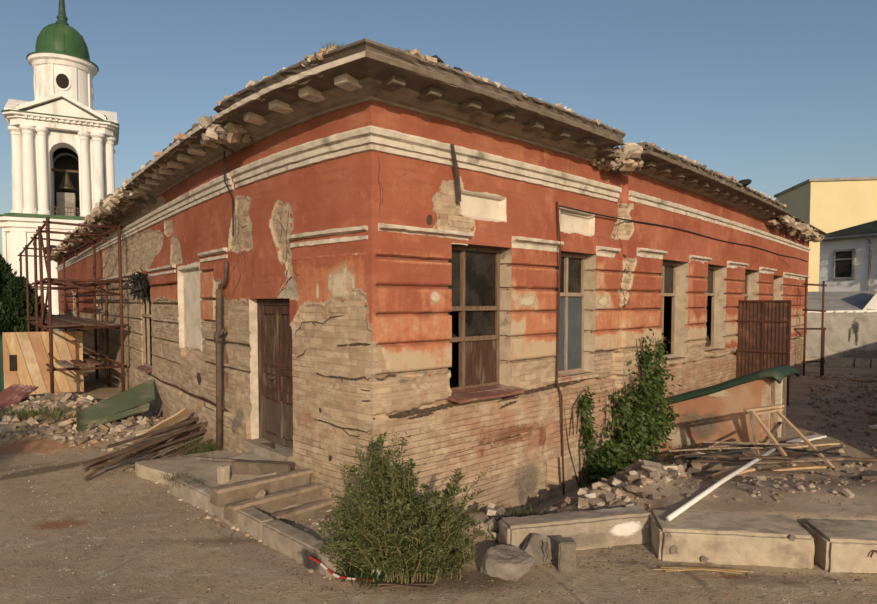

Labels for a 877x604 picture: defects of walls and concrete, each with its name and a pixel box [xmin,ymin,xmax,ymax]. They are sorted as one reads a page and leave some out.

flaking render [426,180,474,233]
flaking render [612,204,633,239]
flaking render [270,202,298,297]
flaking render [617,259,635,305]
spalling [60,197,252,455]
spalling [790,334,807,377]
leakage [844,319,877,359]
spalling [291,290,736,516]